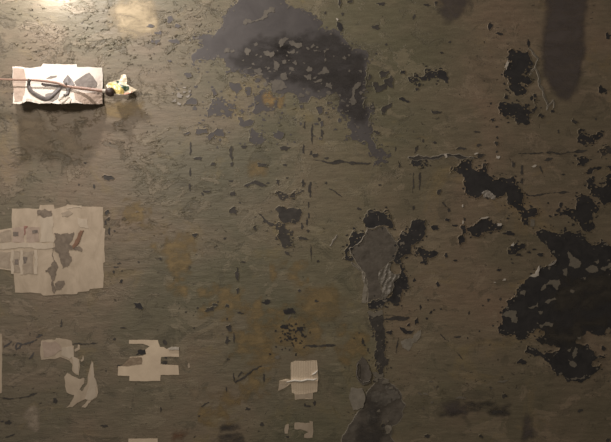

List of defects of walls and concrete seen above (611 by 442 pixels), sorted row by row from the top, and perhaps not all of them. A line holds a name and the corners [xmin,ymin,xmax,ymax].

flaking render [11,0,449,167]
damp [236,35,366,120]
peeling [489,39,555,128]
damp [543,0,586,99]
peeling [243,177,312,257]
peeling [436,118,611,384]
peeling [269,323,311,356]
spalling [342,206,457,410]